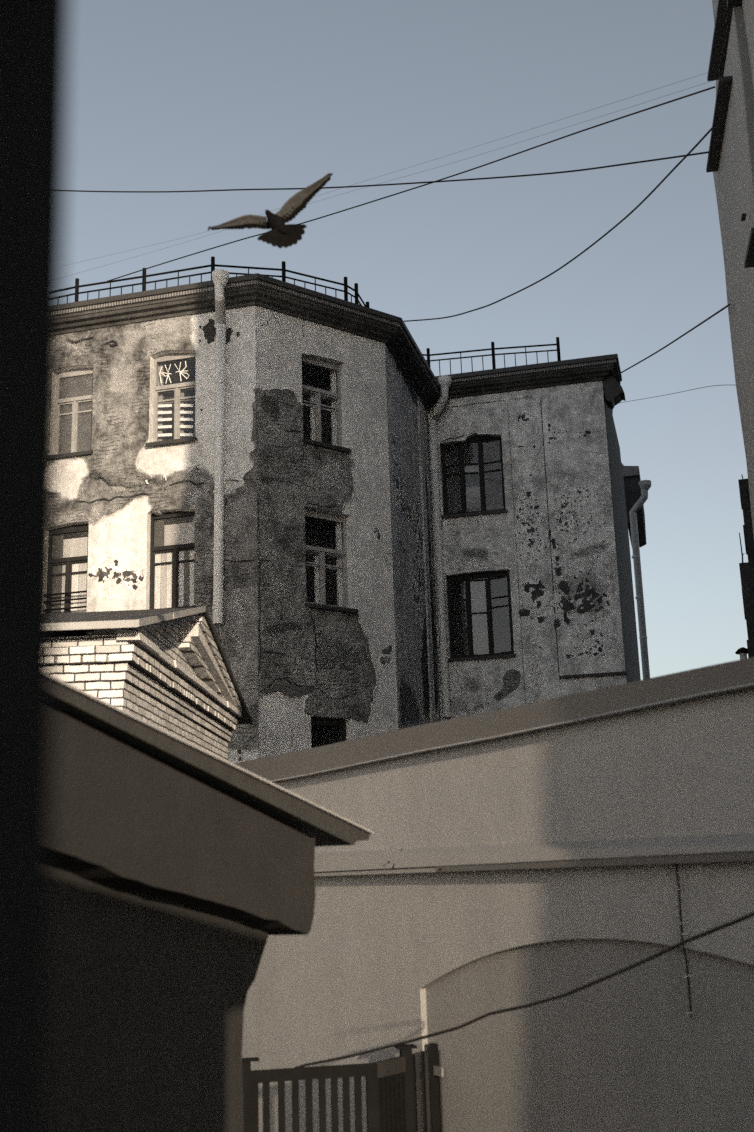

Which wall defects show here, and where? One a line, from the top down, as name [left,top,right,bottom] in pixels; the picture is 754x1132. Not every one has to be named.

spalling [58,315,393,761]
peeling [517,424,591,449]
peeling [494,467,616,701]